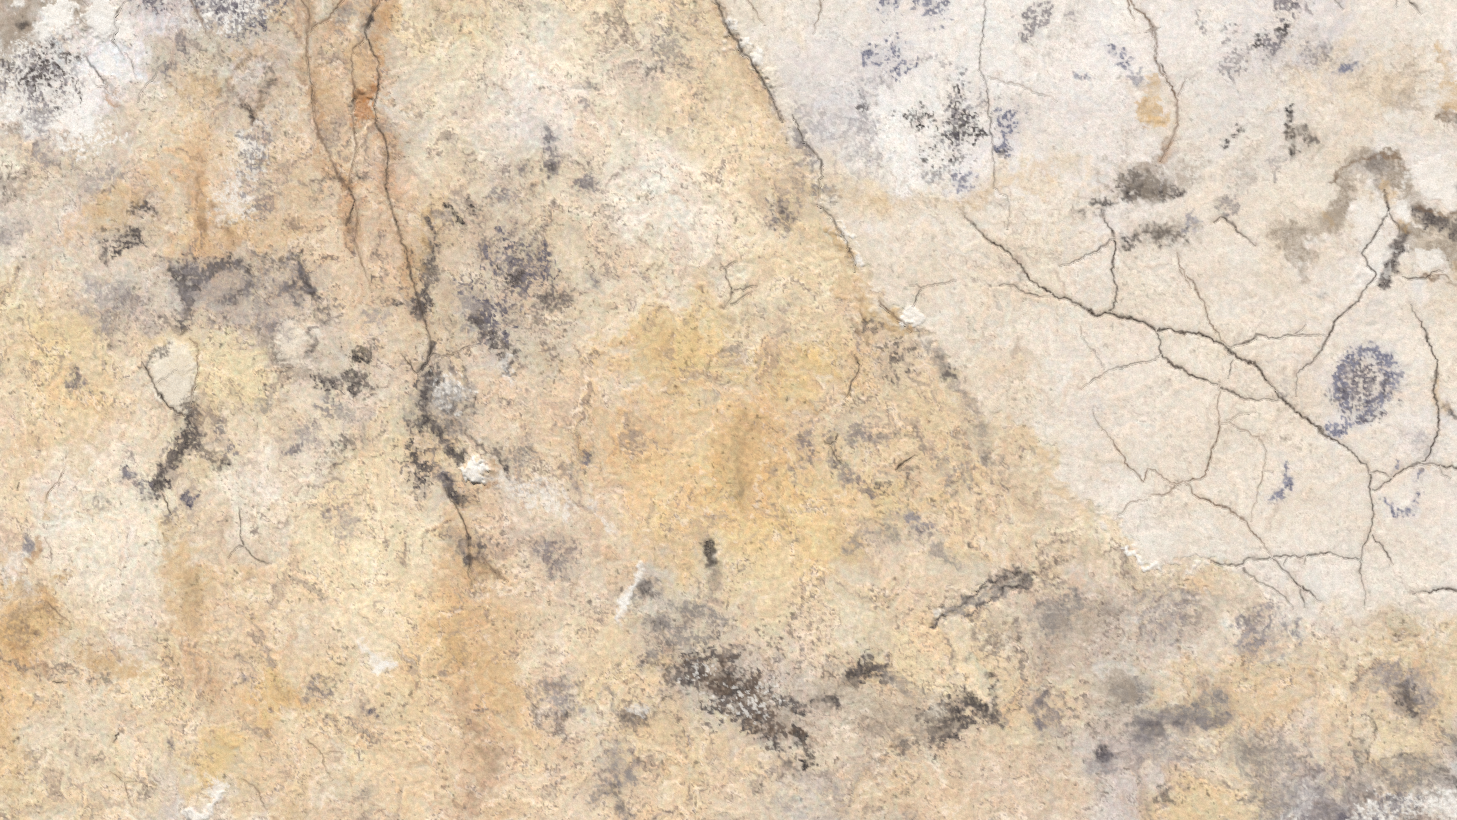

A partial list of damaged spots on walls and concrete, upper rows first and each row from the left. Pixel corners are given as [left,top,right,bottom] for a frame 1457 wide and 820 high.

crack [300,0,480,374]
crack [718,259,757,309]
crack [714,0,856,272]
water stain [760,0,1059,258]
crack [877,278,957,332]
water stain [1010,0,1082,49]
water stain [1070,43,1250,259]
crack [963,0,1457,609]
water stain [1191,0,1457,301]
water stain [1316,339,1407,441]
crack [444,489,509,589]
water stain [529,532,1457,820]